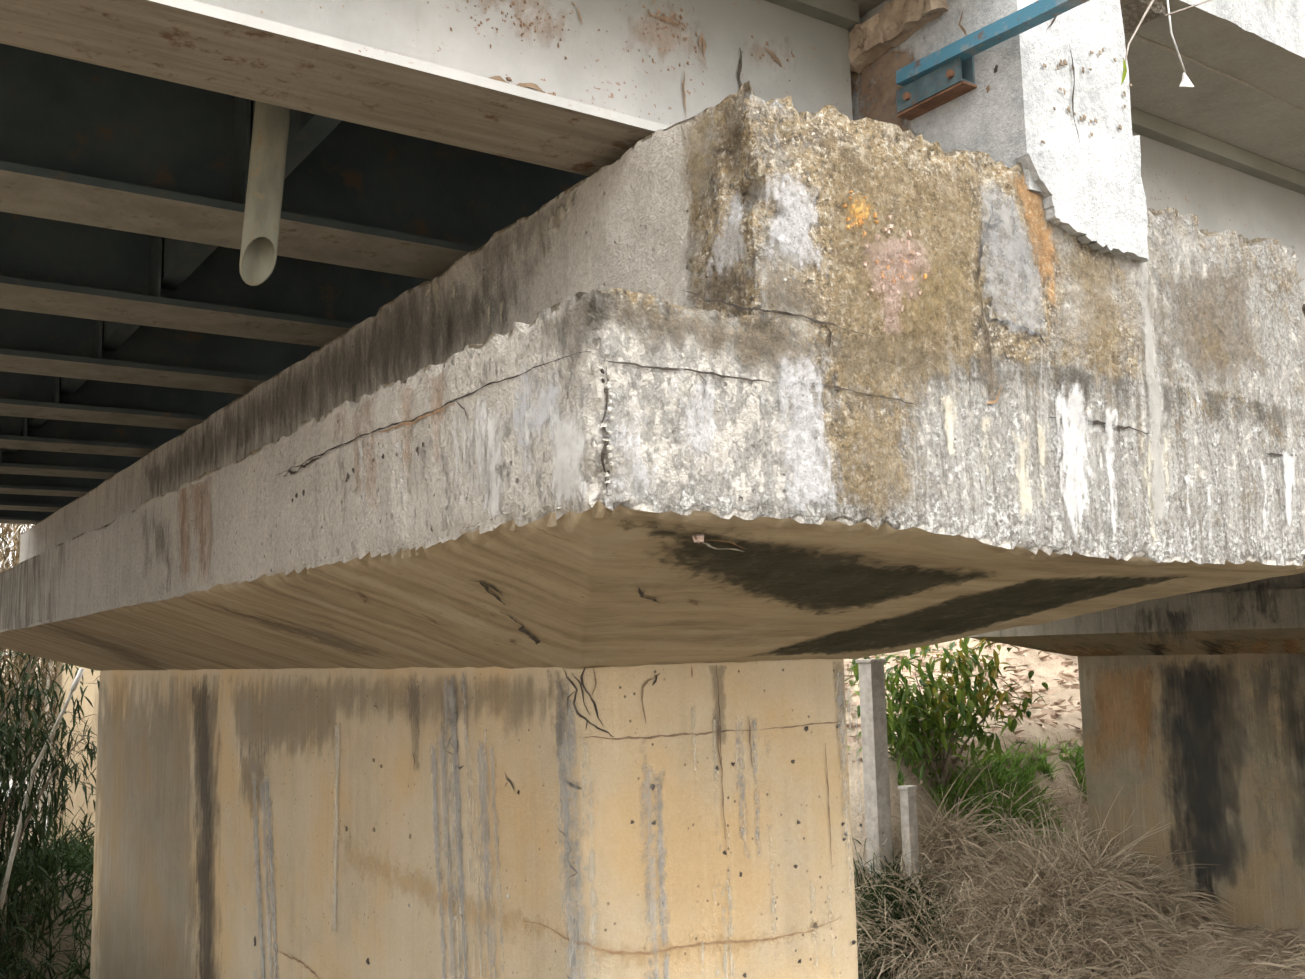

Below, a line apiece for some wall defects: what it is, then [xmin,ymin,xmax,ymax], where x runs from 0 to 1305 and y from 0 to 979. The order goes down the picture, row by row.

rust [467,0,583,60]
rust [625,0,707,112]
rust [737,35,795,87]
spalling [848,0,948,75]
crack [682,290,875,348]
crack [277,351,916,494]
damp [942,398,953,451]
damp [1016,425,1045,515]
damp [1141,439,1168,494]
crack [277,950,318,978]